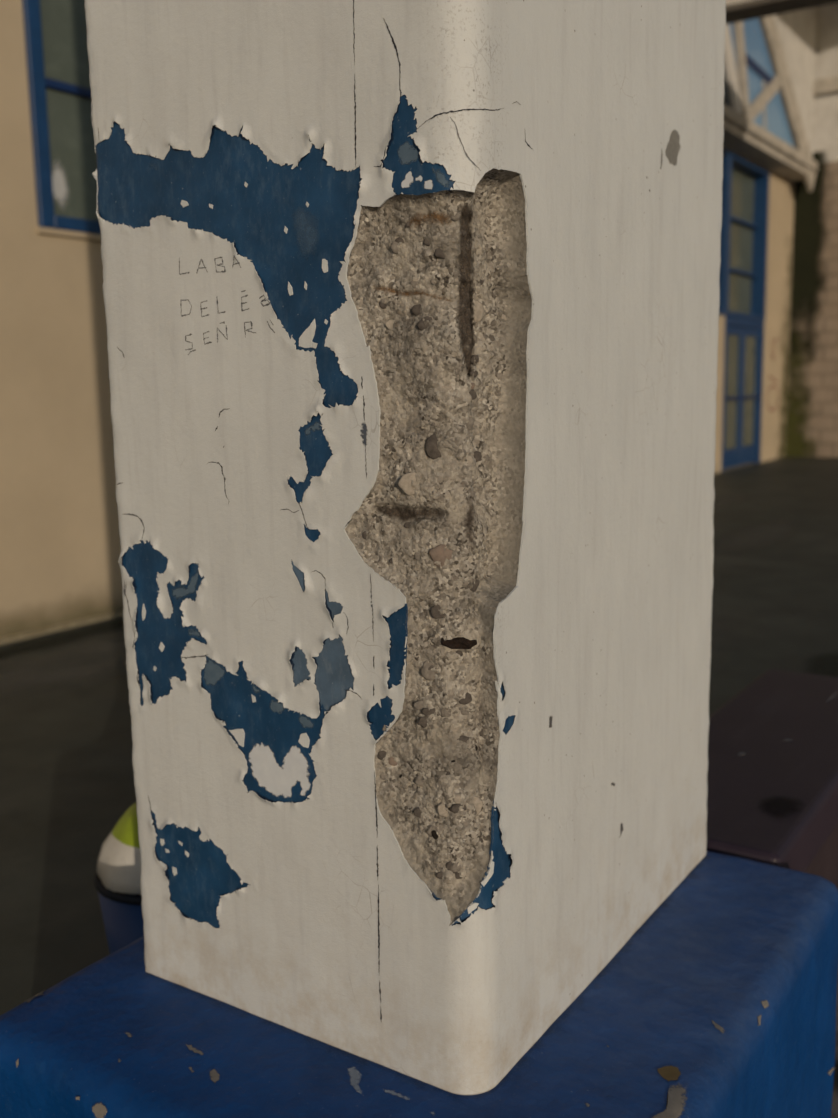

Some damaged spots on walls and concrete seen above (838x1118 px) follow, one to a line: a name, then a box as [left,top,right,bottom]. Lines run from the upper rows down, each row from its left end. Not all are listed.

crack [353,0,386,167]
crack [416,101,521,171]
crack [359,377,367,478]
spalling [96,92,532,928]
crack [332,574,375,698]
crack [374,771,382,1022]
peeling [92,1102,107,1118]
peeling [653,1065,687,1118]